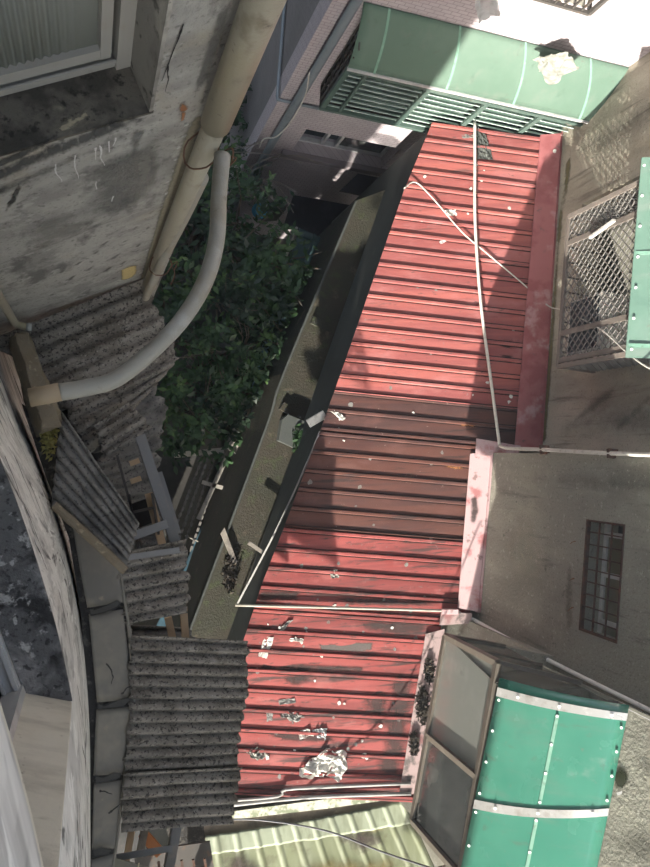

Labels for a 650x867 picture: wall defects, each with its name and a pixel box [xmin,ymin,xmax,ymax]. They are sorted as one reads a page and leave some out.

crack [162,24,184,91]